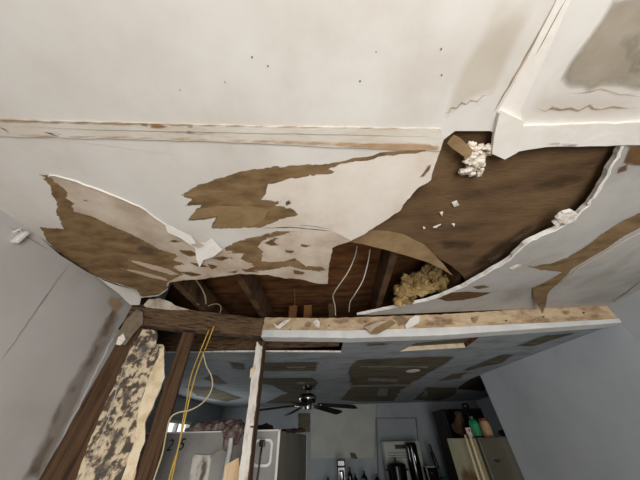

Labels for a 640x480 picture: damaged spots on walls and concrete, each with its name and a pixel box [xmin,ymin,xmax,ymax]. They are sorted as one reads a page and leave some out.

flaking render [458,141,494,177]
peeling [48,150,440,284]
flaking render [551,209,578,227]
peeling [521,333,572,346]
peeling [189,375,240,402]
peeling [341,357,453,402]
peeling [415,354,512,401]
peeling [238,342,317,480]
leakage [31,440,52,473]